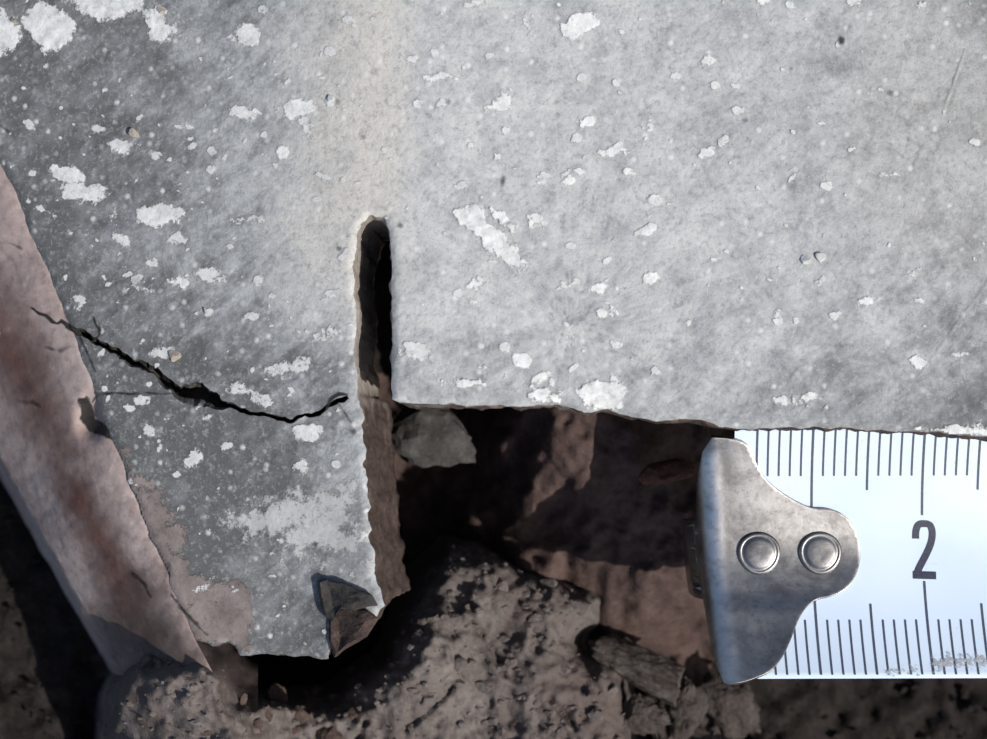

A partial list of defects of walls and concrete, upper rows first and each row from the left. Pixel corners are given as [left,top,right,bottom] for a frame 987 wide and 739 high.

damp [0,0,178,57]
crack [31,307,349,424]